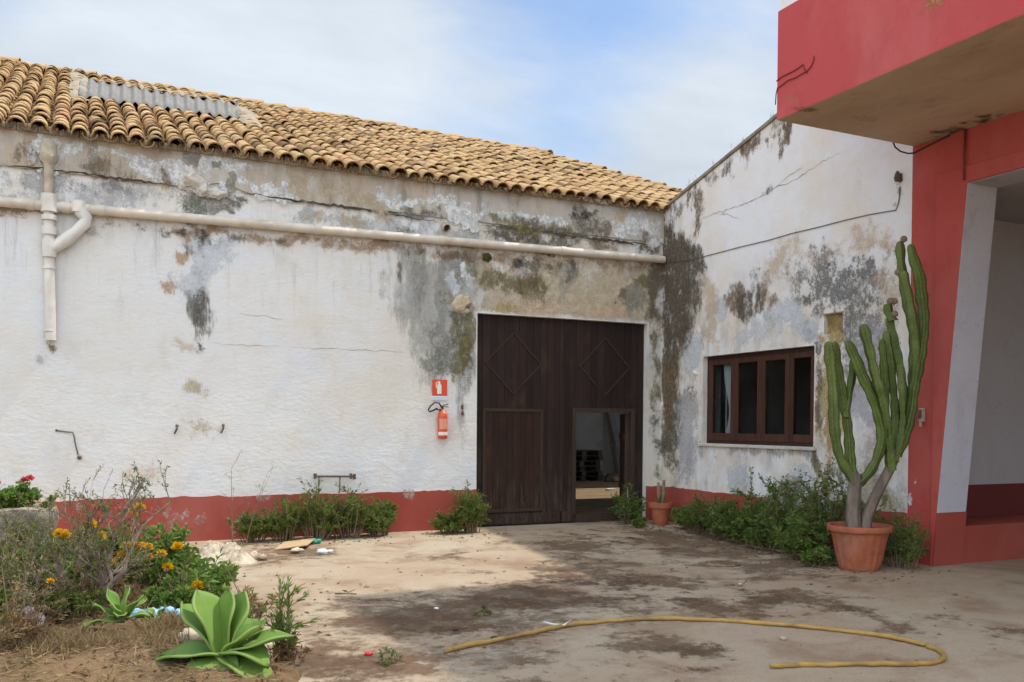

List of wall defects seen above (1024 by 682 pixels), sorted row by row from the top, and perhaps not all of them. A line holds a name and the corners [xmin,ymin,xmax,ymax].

damp [739,114,792,159]
crack [5,160,172,186]
peeling [27,133,300,227]
crack [242,193,437,222]
crack [702,153,841,219]
damp [176,228,211,250]
damp [185,274,211,335]
damp [286,162,899,493]